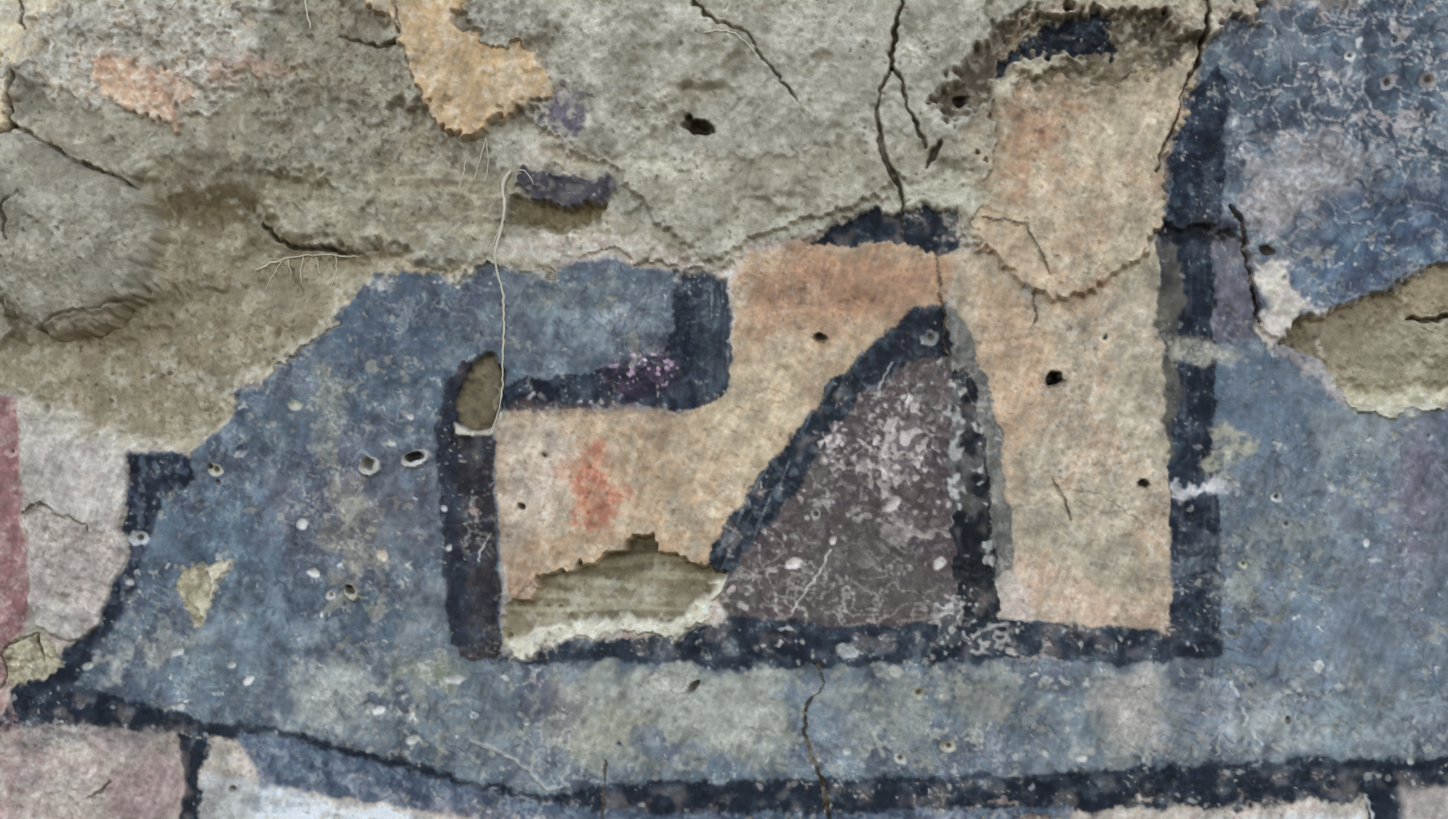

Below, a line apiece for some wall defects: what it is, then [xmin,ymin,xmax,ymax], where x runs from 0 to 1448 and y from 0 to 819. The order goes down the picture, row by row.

crack [3,71,143,192]
crack [692,0,798,102]
crack [874,0,943,237]
crack [1155,0,1212,174]
spalling [0,0,1269,459]
spalling [1278,265,1448,421]
crack [1406,314,1448,325]
peeling [209,464,224,477]
spalling [3,632,65,687]
spalling [176,560,232,628]
spalling [501,535,729,662]
crack [802,661,831,819]